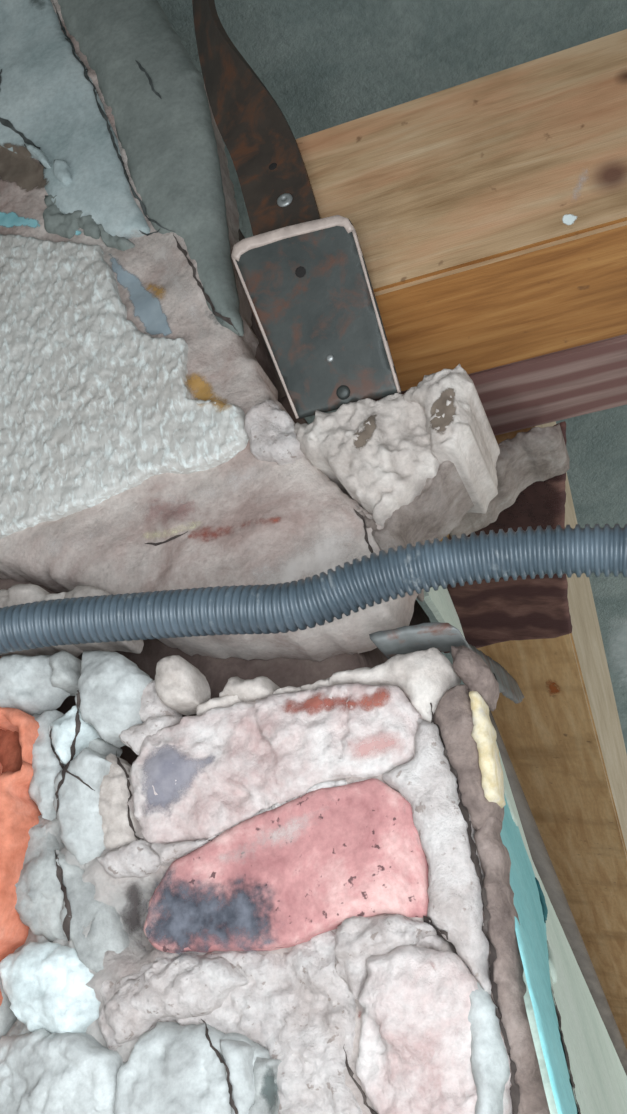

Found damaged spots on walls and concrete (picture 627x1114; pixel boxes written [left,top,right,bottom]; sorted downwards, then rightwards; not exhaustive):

crack [0,118,46,169]
crack [52,1,239,334]
spalling [0,142,172,336]
crack [49,690,95,816]
crack [116,751,144,840]
crack [423,916,448,940]
crack [430,703,520,1114]
peeling [500,787,579,1114]
crack [201,1019,238,1114]
crack [343,1047,377,1114]